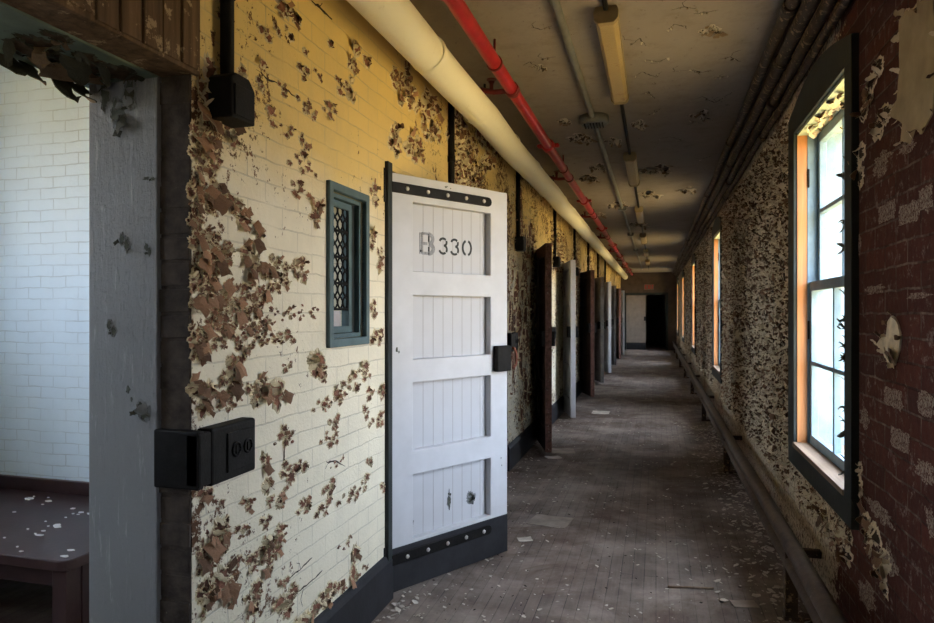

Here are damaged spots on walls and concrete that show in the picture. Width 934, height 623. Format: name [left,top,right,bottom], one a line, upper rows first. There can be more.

peeling [0,29,145,138]
peeling [387,61,498,189]
peeling [806,0,934,190]
peeling [113,232,132,254]
peeling [369,178,381,209]
peeling [370,226,385,276]
peeling [185,52,373,623]
peeling [306,348,386,449]
peeling [369,299,384,347]
peeling [684,114,892,601]
peeling [870,311,902,368]